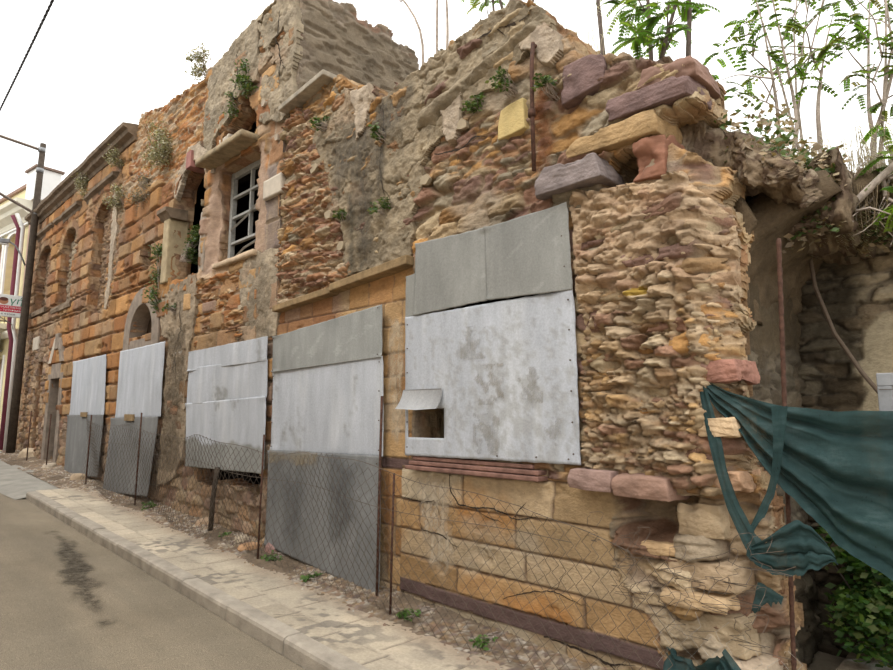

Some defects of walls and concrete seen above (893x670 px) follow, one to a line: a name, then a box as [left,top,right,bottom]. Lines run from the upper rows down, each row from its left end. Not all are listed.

flaking render [156,0,564,487]